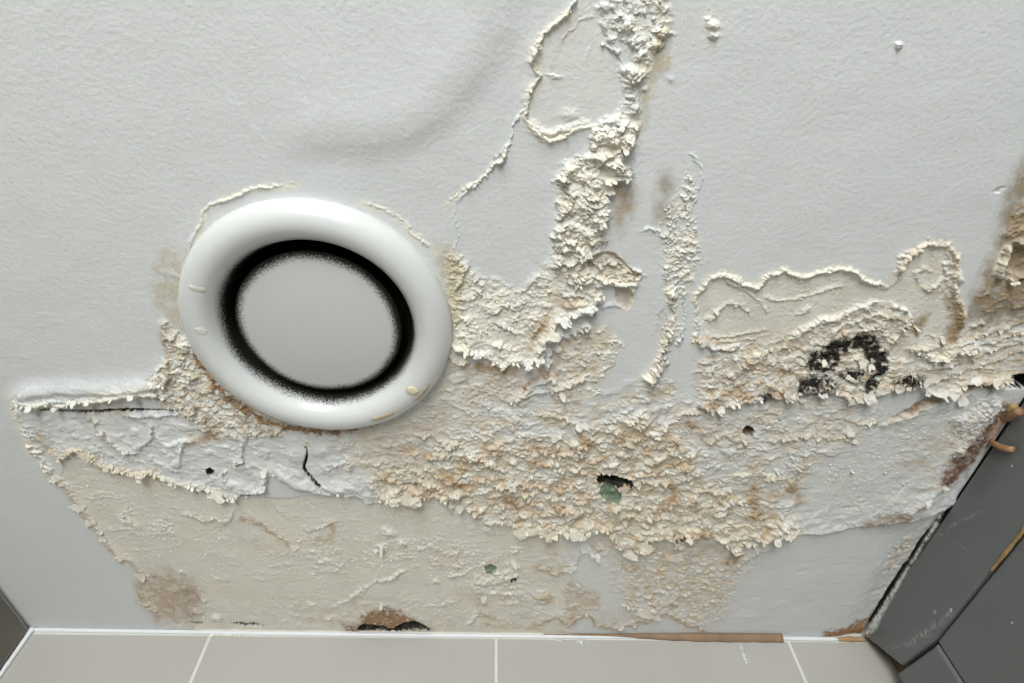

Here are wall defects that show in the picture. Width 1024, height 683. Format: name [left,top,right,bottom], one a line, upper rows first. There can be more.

crack [438,102,531,270]
damp [946,177,1024,339]
crack [24,407,178,415]
crack [303,447,327,492]
flaking render [58,145,1024,643]
damp [798,332,923,395]